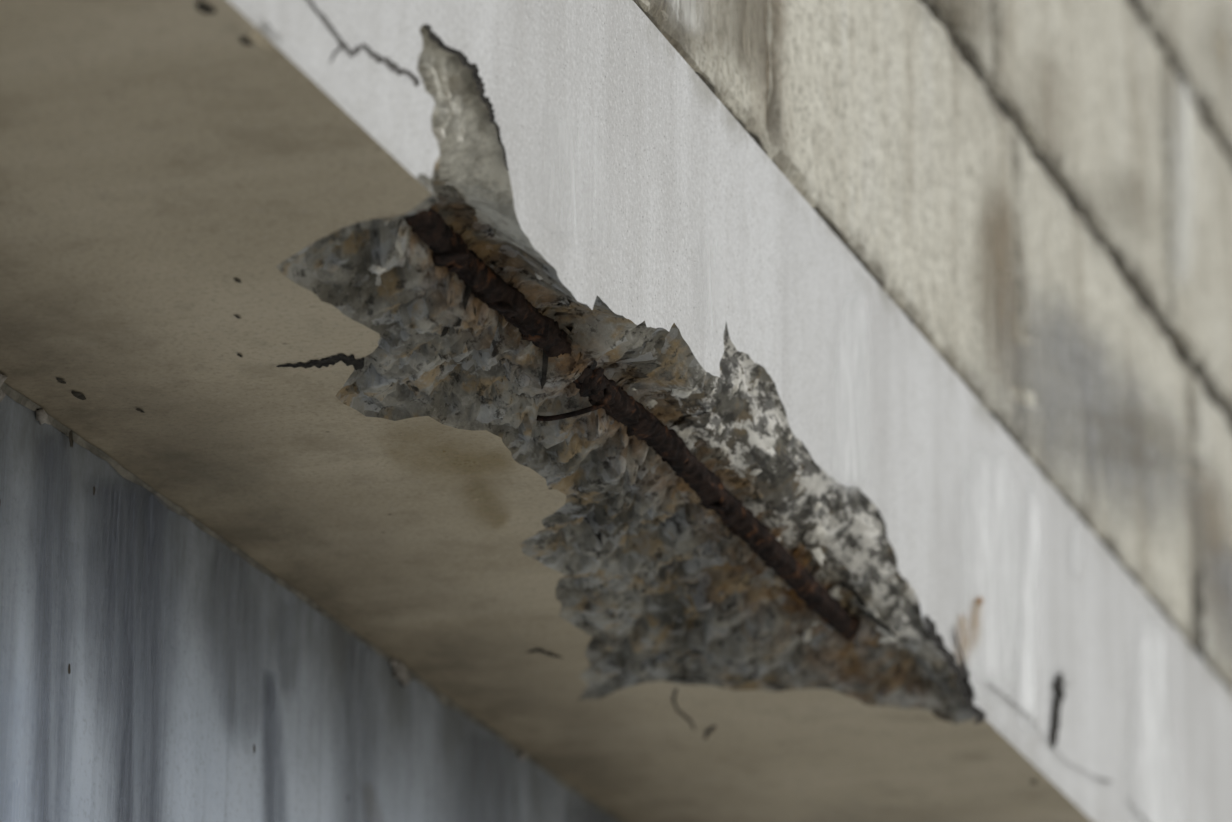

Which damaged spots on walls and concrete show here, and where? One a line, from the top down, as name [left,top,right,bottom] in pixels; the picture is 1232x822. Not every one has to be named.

crack [308,0,420,86]
crack [277,353,365,370]
spalling [276,24,977,724]
water stain [94,488,163,822]